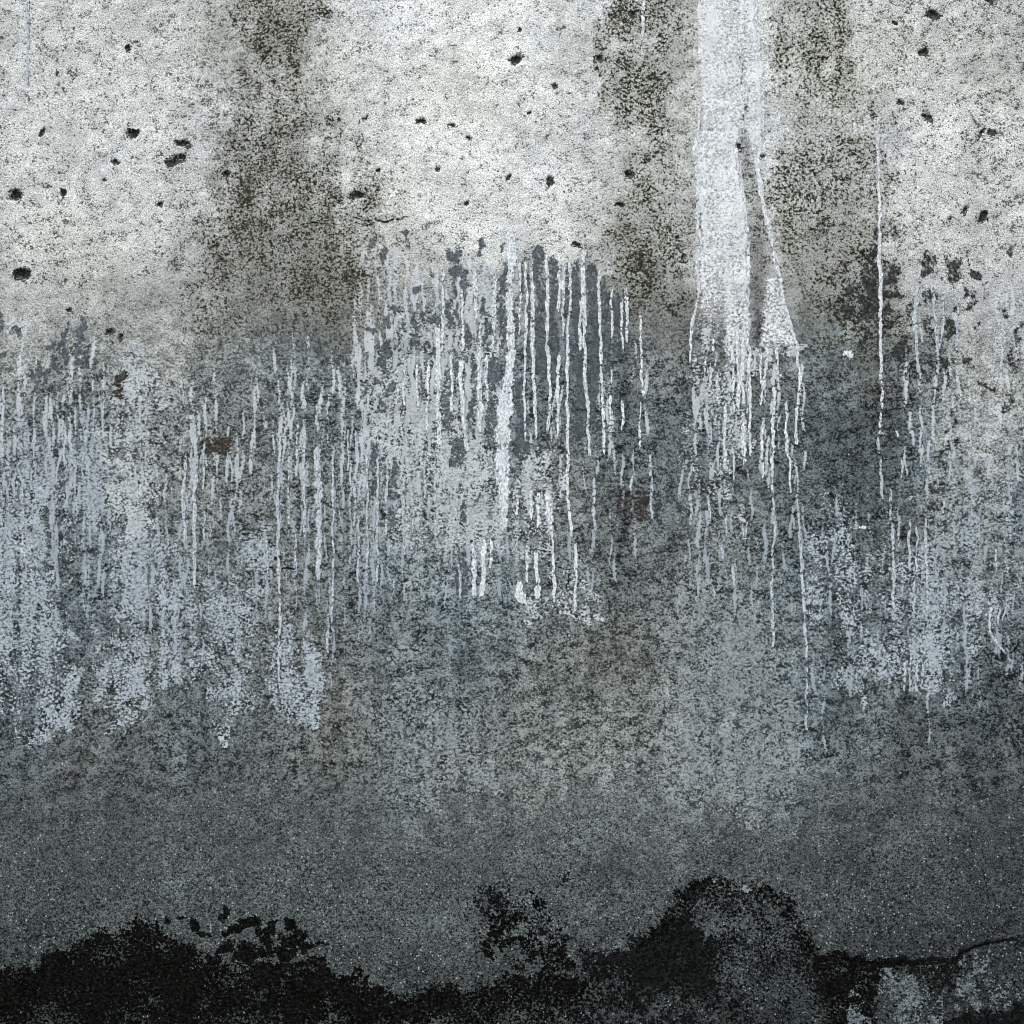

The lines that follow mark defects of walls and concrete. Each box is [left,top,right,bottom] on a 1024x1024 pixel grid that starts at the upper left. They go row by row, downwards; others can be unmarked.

damp [0,336,510,814]
damp [353,230,654,636]
damp [656,0,1024,830]
damp [0,875,1024,1024]
crack [876,937,1024,985]